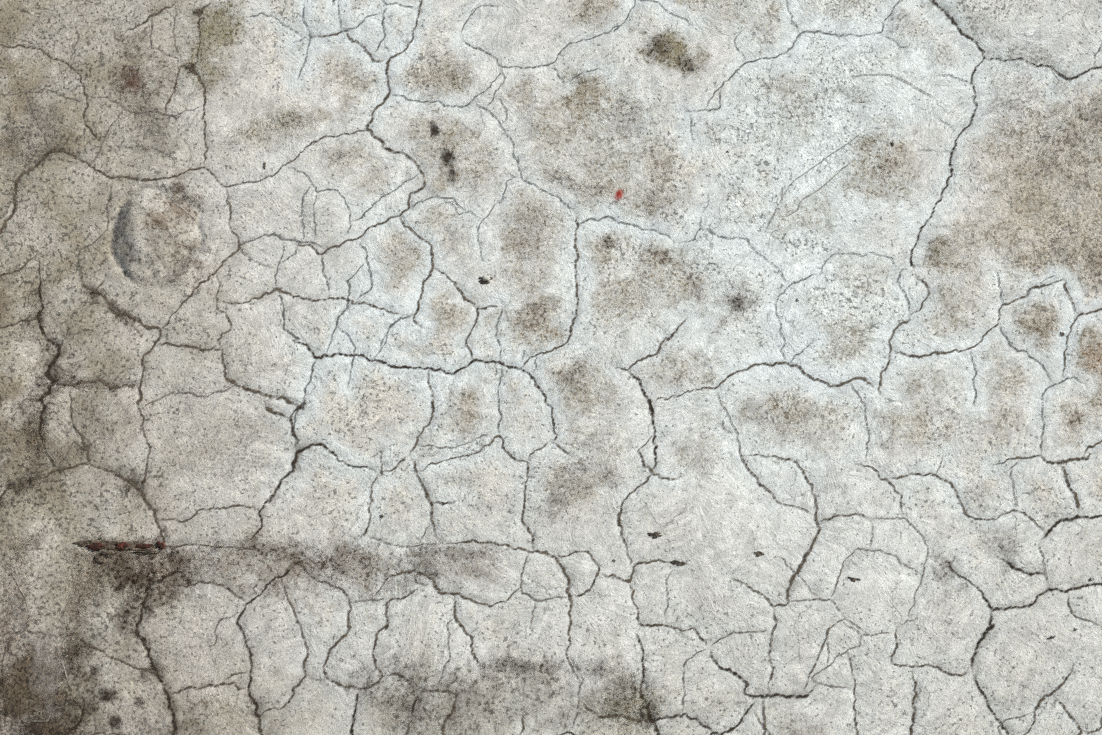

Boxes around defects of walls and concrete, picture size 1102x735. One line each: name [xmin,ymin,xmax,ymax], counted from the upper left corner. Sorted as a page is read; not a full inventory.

crack [687,0,909,138]
crack [822,0,1102,312]
crack [0,0,691,562]
crack [62,219,1102,735]
crack [2,630,54,716]
crack [19,701,85,735]
damp [110,716,123,730]